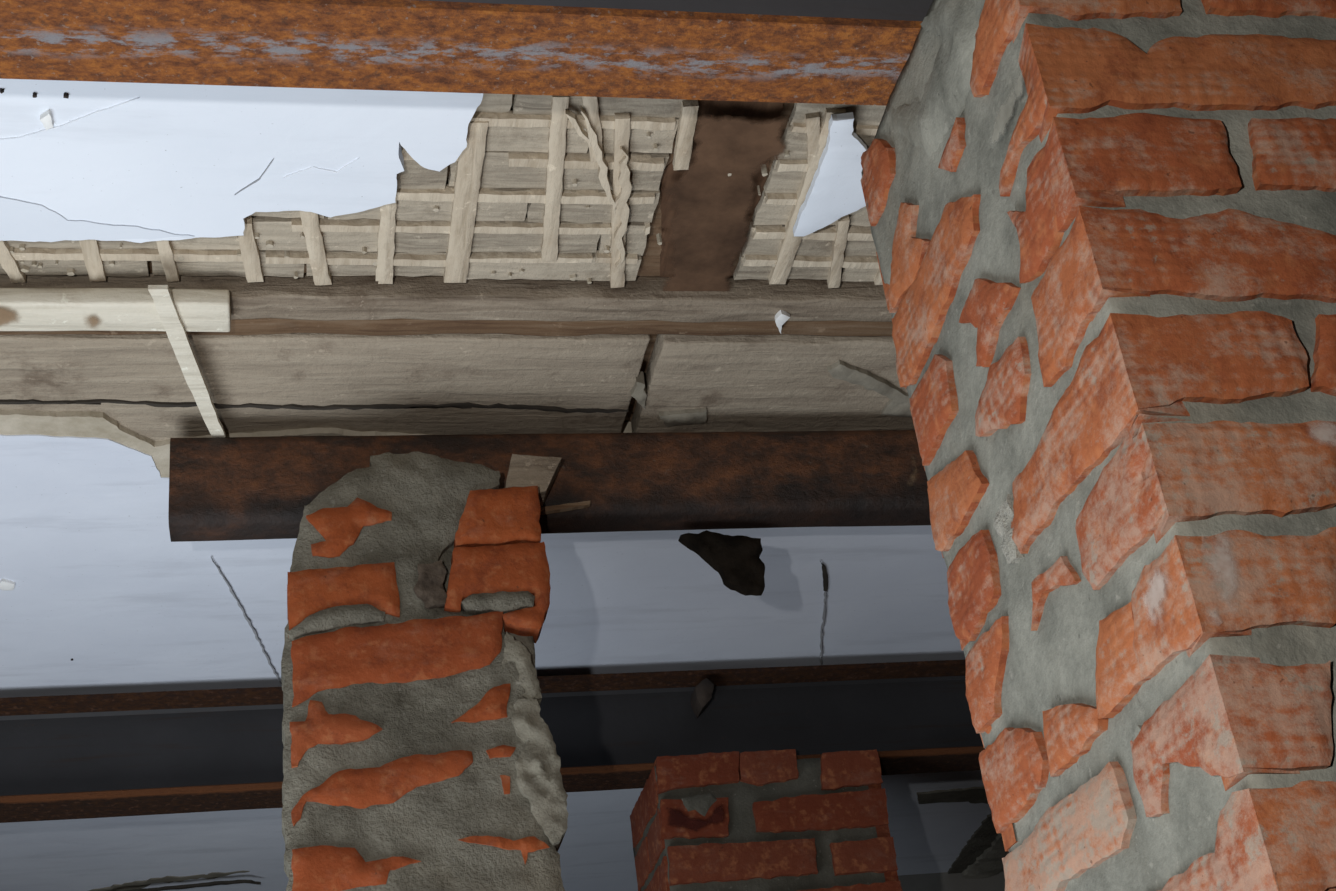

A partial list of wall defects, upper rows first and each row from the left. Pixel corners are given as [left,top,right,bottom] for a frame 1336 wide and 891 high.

crack [0,97,139,140]
crack [234,157,359,195]
flaking render [793,112,867,236]
peeling [0,197,194,242]
spalling [994,494,1025,564]
spalling [89,870,261,891]